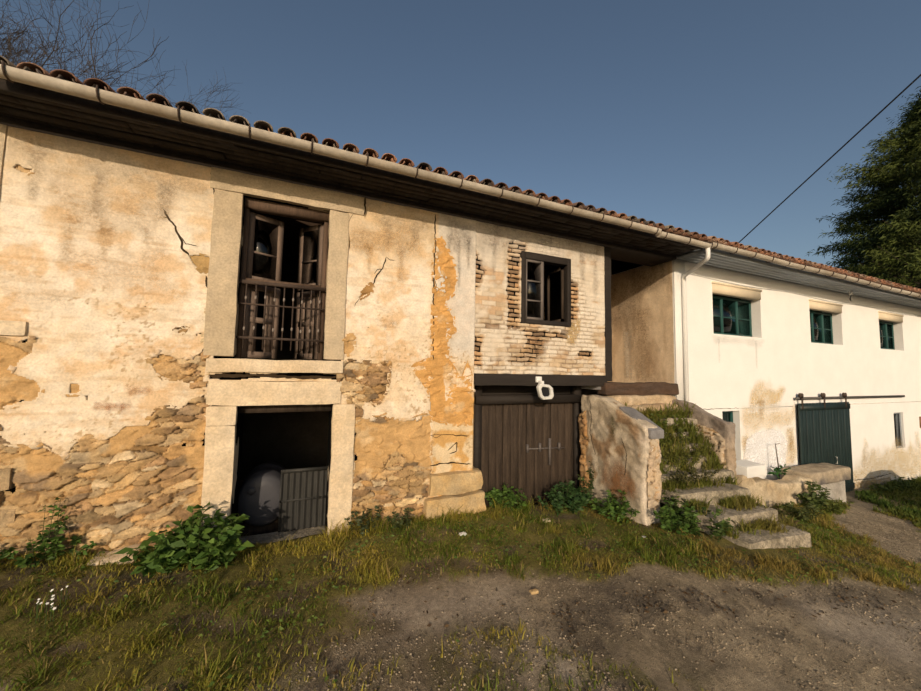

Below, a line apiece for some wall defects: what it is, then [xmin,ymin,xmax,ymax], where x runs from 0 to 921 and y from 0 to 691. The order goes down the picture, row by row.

crack [162,209,196,255]
spalling [475,251,487,294]
spalling [506,240,567,364]
spalling [571,283,579,322]
spalling [336,236,484,529]
spalling [0,333,211,555]
water stain [745,390,795,467]